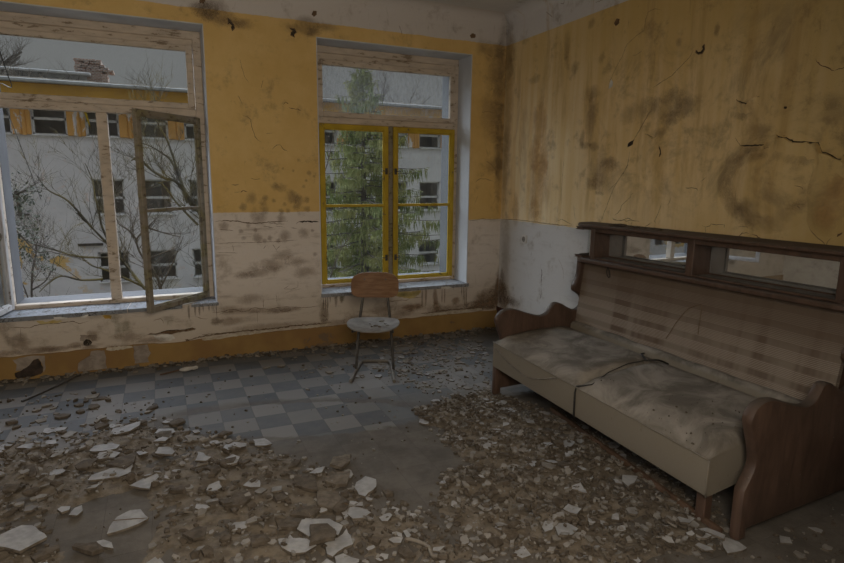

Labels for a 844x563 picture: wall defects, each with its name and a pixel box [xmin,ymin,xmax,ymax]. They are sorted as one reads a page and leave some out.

damp [470,274,515,309]
spalling [15,359,43,378]